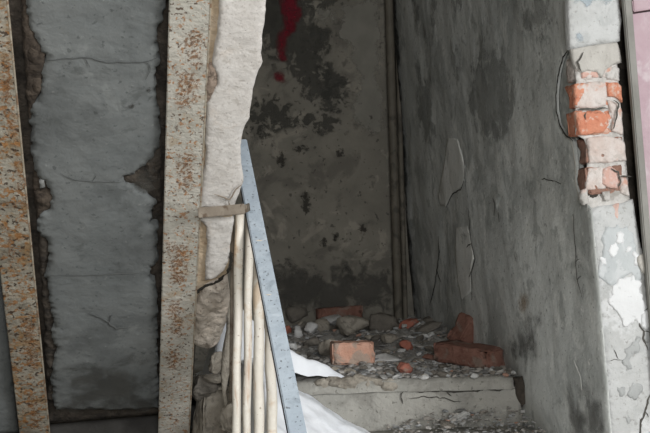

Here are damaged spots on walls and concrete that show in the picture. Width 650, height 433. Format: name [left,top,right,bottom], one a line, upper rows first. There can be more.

flaking render [22,0,46,119]
crack [47,57,157,80]
rust [176,71,198,107]
rust [184,31,202,66]
flaking render [32,164,52,219]
flaking render [124,134,162,203]
rust [177,153,194,191]
flaking render [565,42,647,327]
rust [167,242,187,284]
crack [467,210,475,300]
flaking render [38,232,57,401]
peeling [617,382,643,400]